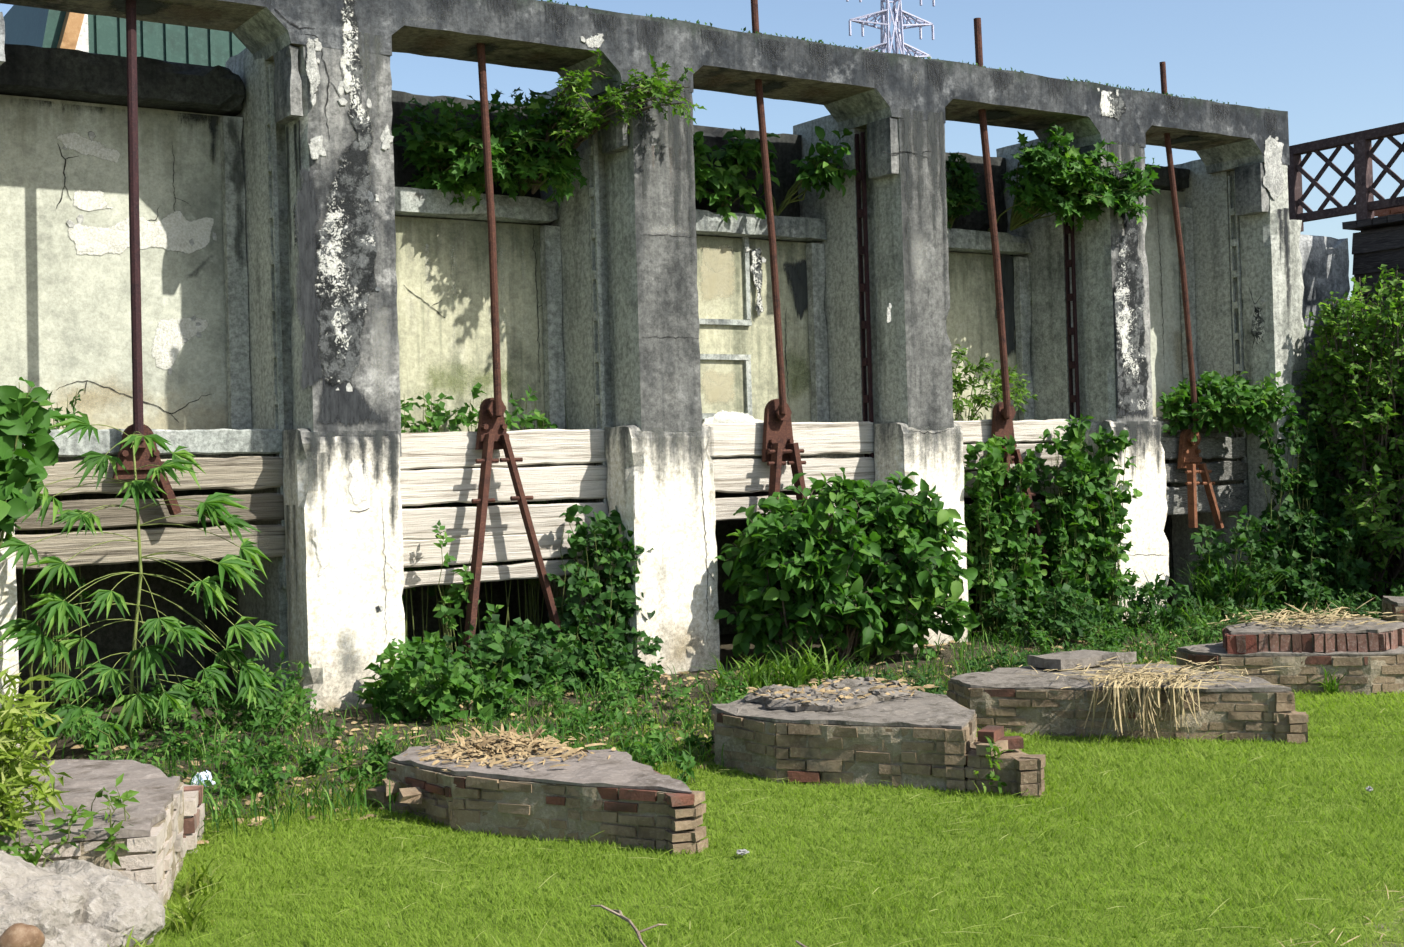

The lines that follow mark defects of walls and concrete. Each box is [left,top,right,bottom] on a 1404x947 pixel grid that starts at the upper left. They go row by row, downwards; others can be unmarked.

crack [56,143,77,209]
peeling [56,131,120,163]
peeling [66,189,217,256]
leakage [784,260,808,320]
peeling [152,315,208,376]
leakage [286,120,398,600]
crack [58,380,210,421]